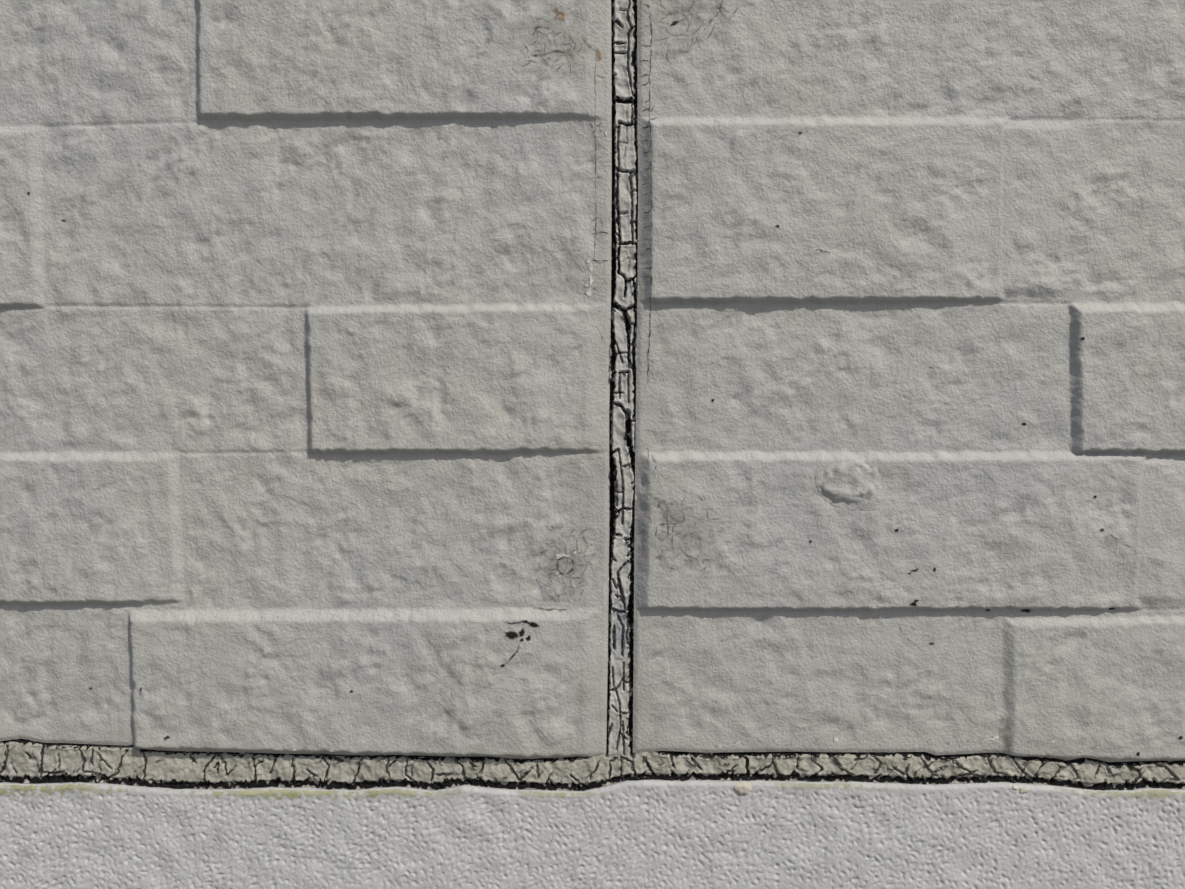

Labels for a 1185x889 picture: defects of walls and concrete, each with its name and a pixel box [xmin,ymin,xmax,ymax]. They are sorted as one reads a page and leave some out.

crack [521,18,591,75]
crack [660,0,737,40]
crack [590,116,607,178]
crack [606,0,638,755]
crack [536,526,593,611]
crack [642,501,715,569]